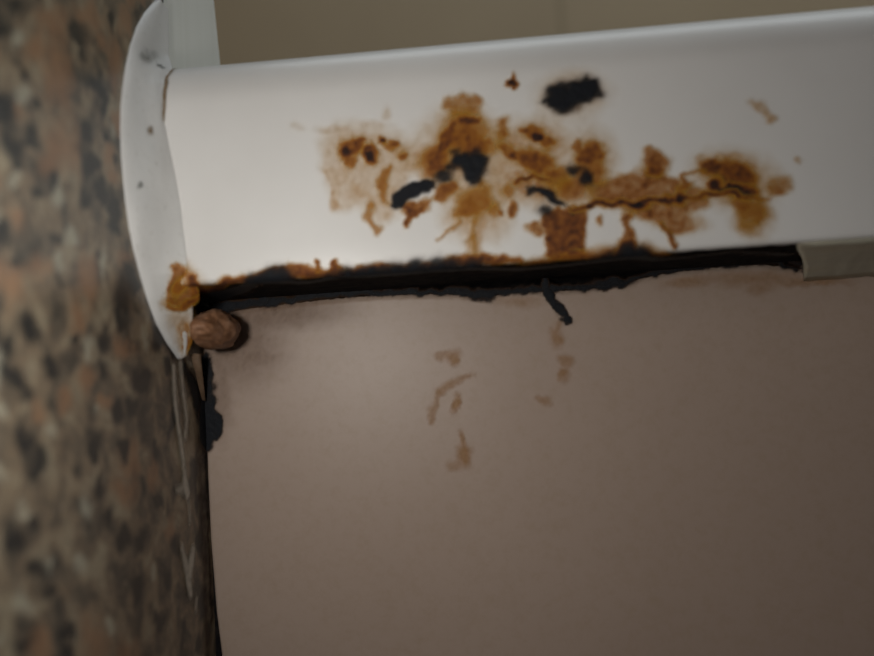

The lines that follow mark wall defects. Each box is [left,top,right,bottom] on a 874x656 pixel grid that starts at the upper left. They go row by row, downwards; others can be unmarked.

corrosion [505,74,519,90]
peeling [541,75,603,115]
corrosion [338,93,618,265]
crack [193,146,803,325]
corrosion [698,154,791,230]
corrosion [166,259,389,352]